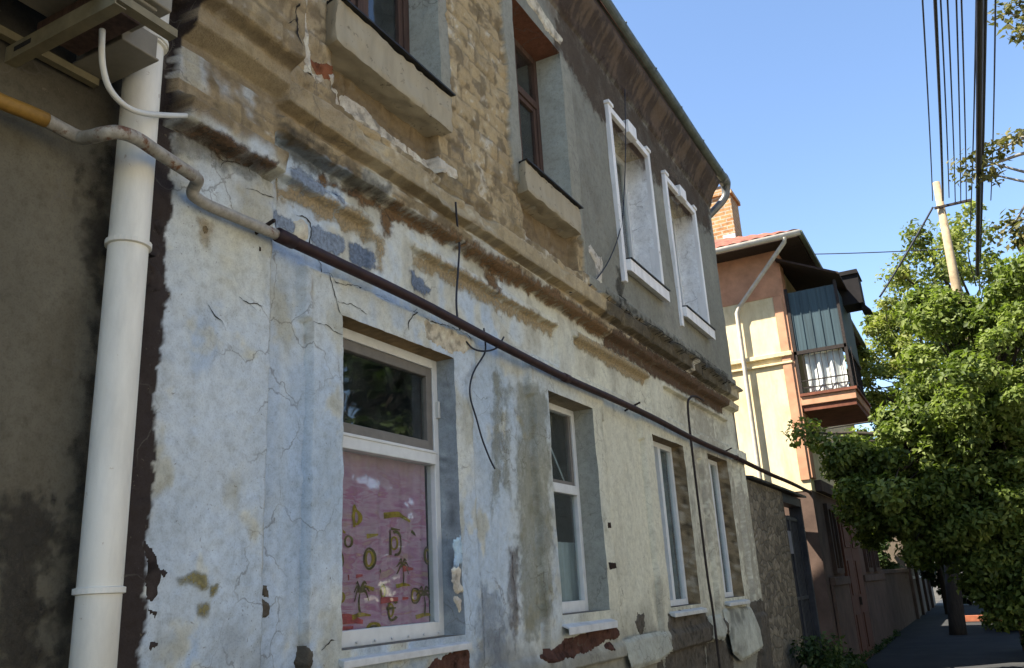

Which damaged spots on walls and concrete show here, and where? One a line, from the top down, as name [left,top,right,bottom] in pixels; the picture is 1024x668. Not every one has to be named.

crack [217,156,274,198]
water stain [84,186,109,266]
peeling [312,225,376,270]
crack [297,215,472,341]
water stain [69,374,95,513]
water stain [0,493,79,668]
peeling [143,541,167,618]
water stain [180,571,218,616]
peeling [451,536,464,612]
flaking render [294,646,313,668]
flaking render [428,649,470,668]
flaking render [540,628,620,663]